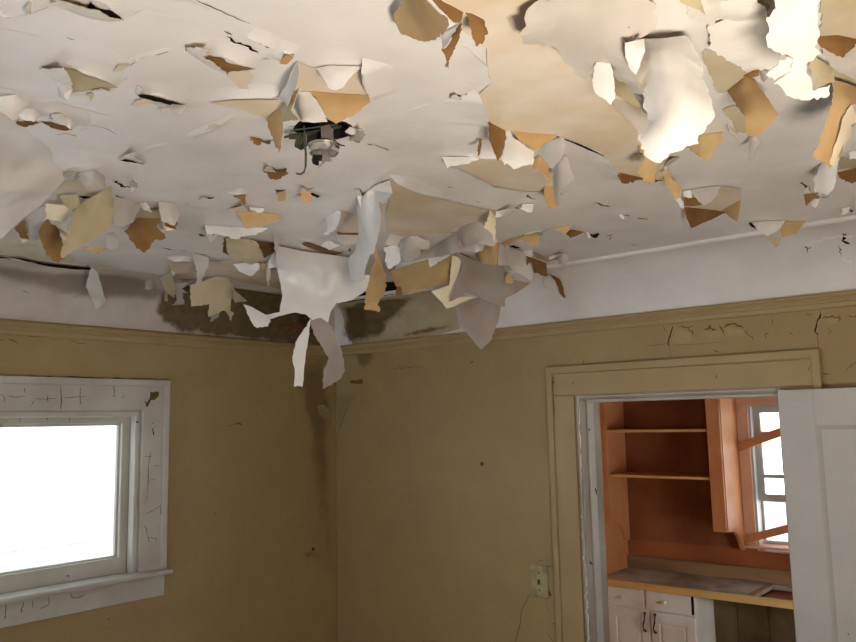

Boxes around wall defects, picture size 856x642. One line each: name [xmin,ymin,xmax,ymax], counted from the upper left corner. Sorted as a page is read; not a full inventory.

peeling [40,57,131,101]
peeling [207,40,398,154]
peeling [393,0,856,228]
peeling [0,112,179,264]
peeling [263,166,288,202]
peeling [86,267,106,311]
damp [157,286,321,345]
peeling [144,175,584,389]
damp [338,290,461,344]
crack [0,387,86,422]
crack [145,451,161,541]
crack [4,575,86,619]